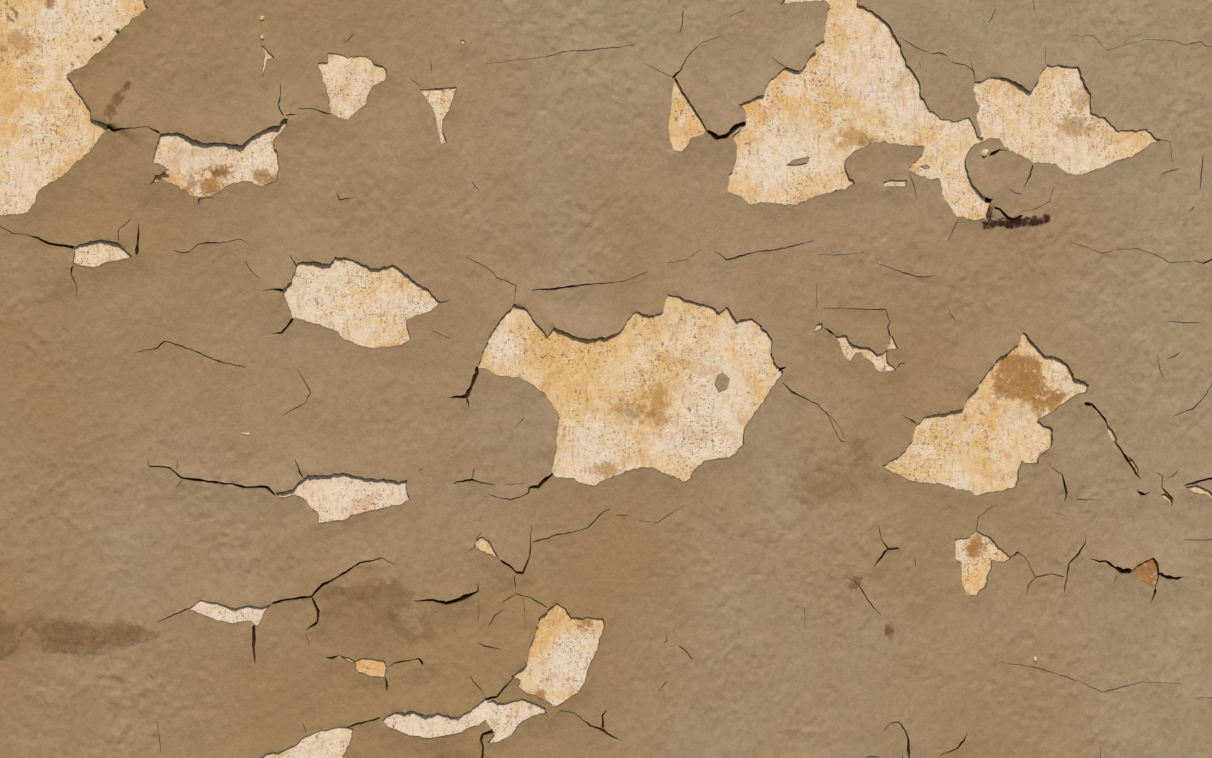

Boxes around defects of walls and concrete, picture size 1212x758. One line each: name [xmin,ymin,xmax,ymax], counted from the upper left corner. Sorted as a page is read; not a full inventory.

peeling [0,0,151,215]
peeling [727,0,1159,226]
peeling [278,251,439,348]
crack [150,466,275,495]
crack [451,367,478,406]
peeling [472,294,785,488]
peeling [883,331,1091,495]
crack [1084,402,1212,500]
crack [273,558,387,628]
crack [415,514,600,648]
crack [1010,543,1181,598]
peeling [383,599,604,748]